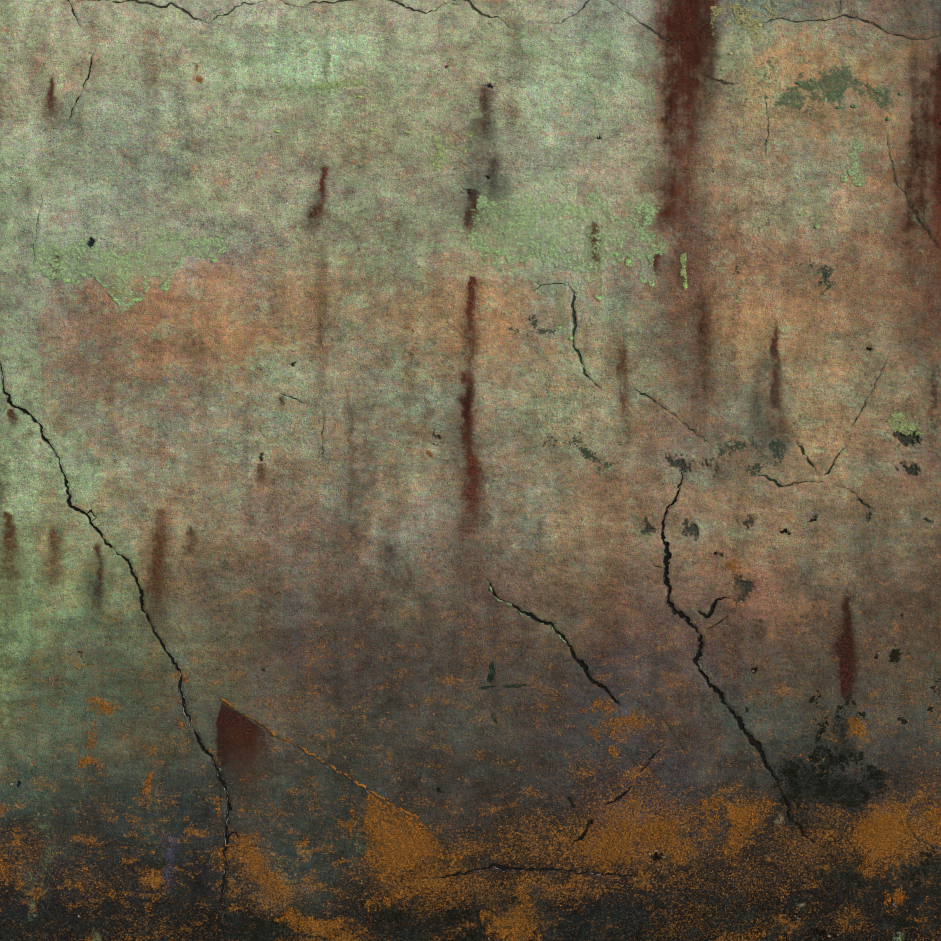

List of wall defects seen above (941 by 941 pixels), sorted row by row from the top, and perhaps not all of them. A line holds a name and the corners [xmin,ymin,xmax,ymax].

crack [67,0,353,27]
rust [655,0,716,284]
peeling [30,230,230,308]
peeling [461,182,669,300]
rust [458,276,482,535]
crack [0,364,280,941]
rust [216,703,262,768]
crack [487,581,688,845]
crack [654,464,822,847]
water stain [349,794,468,911]
water stain [578,791,771,878]
water stain [480,885,545,941]